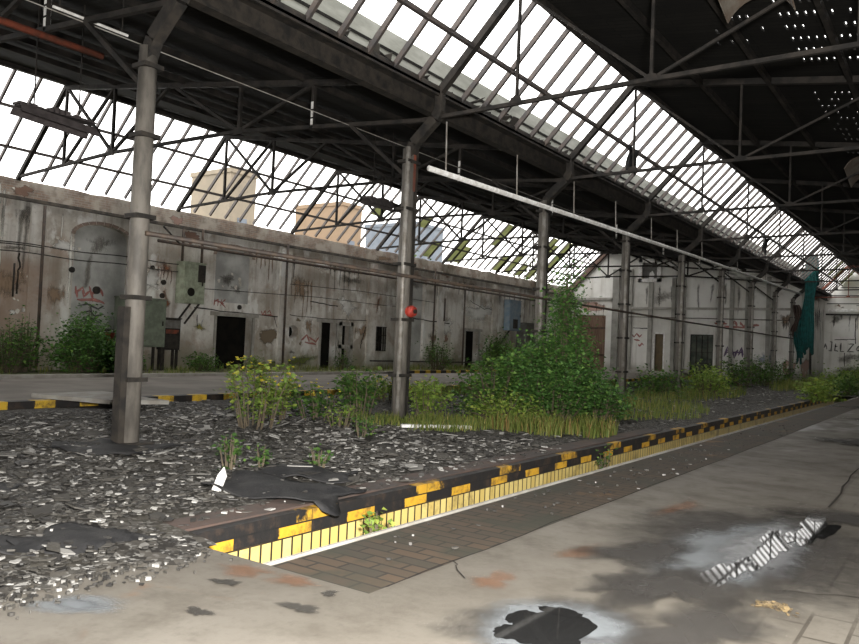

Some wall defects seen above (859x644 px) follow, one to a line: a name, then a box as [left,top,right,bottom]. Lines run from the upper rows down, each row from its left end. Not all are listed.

leakage [17,206,31,268]
spalling [260,326,277,347]
crack [828,468,859,508]
leakage [784,510,859,526]
leakage [587,541,758,644]